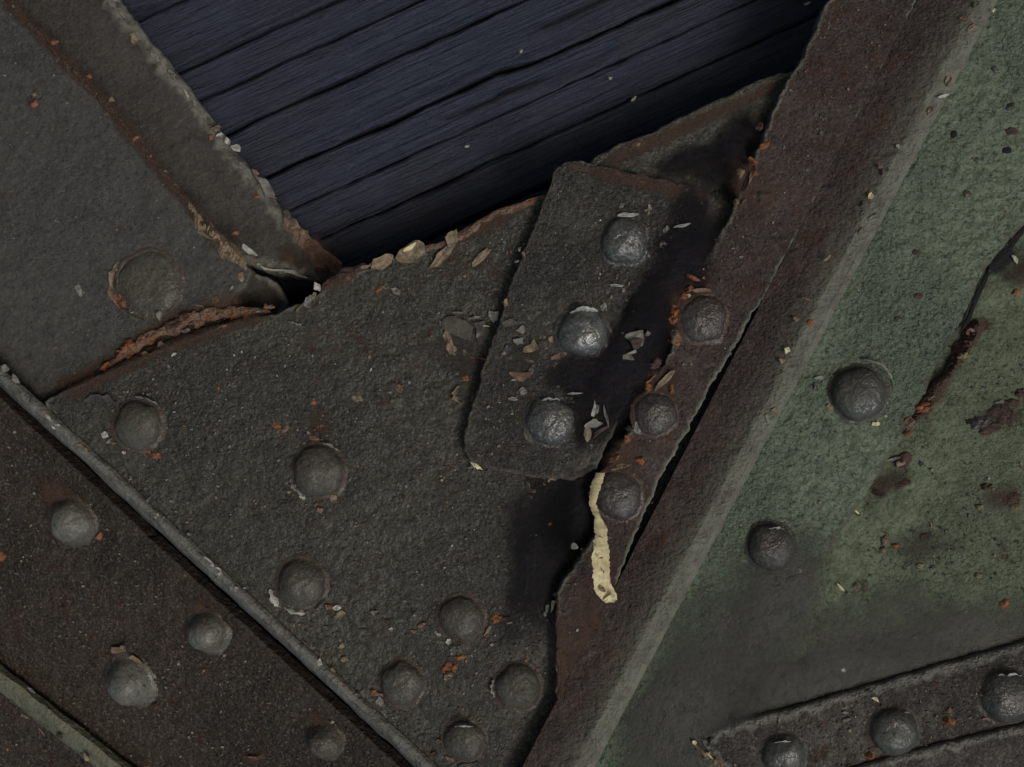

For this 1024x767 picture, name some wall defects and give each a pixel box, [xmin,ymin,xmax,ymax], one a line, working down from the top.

rust [282,217,369,293]
rust [668,274,712,346]
rust [58,296,275,398]
rust [609,422,645,470]
rust [645,357,675,394]
rust [902,319,984,436]
spalling [965,388,1024,435]